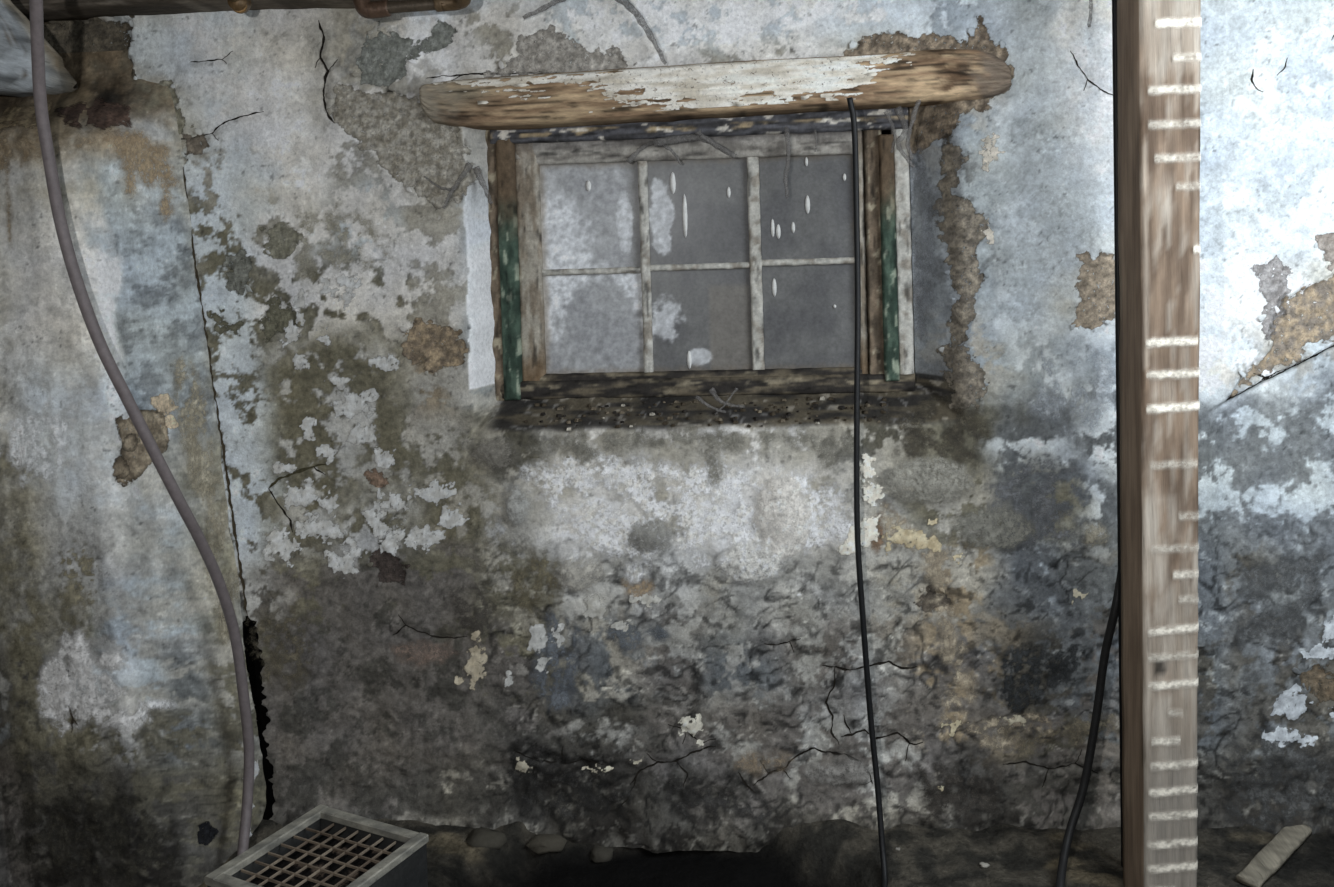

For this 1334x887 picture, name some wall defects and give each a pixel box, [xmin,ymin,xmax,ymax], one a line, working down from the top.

crack [315,20,338,123]
peeling [429,15,1015,409]
flaking render [1070,251,1115,330]
flaking render [1230,233,1334,397]
leakage [0,403,71,483]
crack [181,111,275,820]
crack [269,464,327,532]
peeling [262,376,470,587]
crack [616,724,716,812]
crack [738,638,923,793]
leakage [1000,644,1087,715]
peeling [1262,615,1334,748]